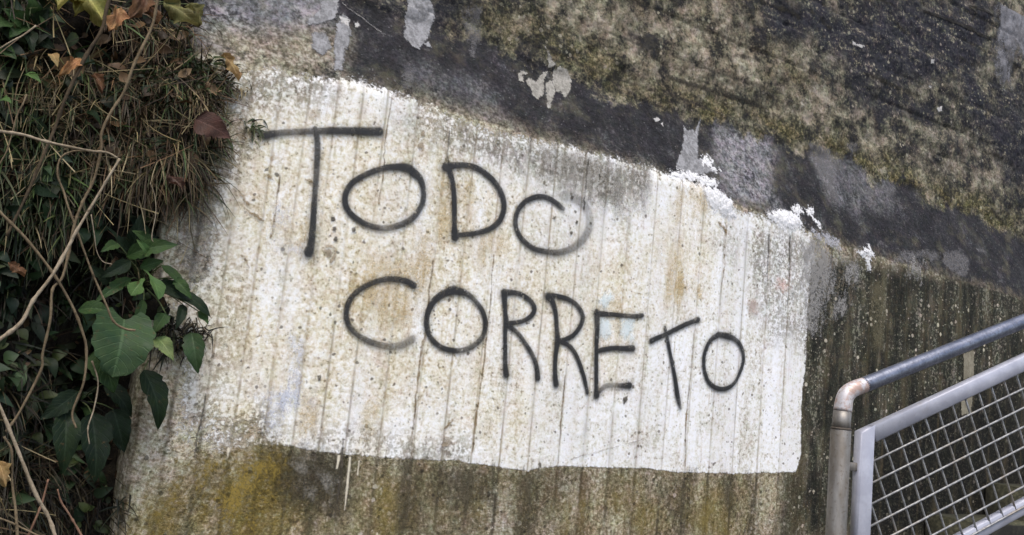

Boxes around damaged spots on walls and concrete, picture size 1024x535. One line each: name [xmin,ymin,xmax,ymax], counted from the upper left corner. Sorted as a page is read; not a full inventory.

peeling [403,0,435,50]
peeling [518,46,572,109]
leakage [995,44,1014,86]
peeling [676,119,713,175]
leakage [667,153,737,221]
leakage [767,204,841,250]
leakage [856,244,875,273]
leakage [961,397,972,415]